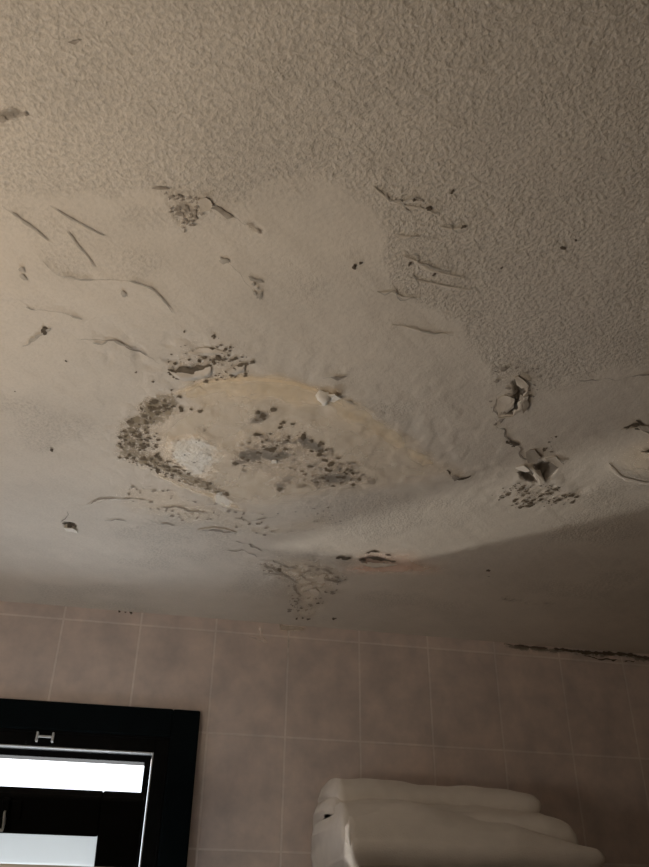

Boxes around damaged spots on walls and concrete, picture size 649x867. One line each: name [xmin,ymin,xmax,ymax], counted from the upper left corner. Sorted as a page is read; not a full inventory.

spalling [152,187,261,234]
peeling [81,334,255,391]
water stain [117,394,232,506]
peeling [227,408,376,492]
spalling [489,366,578,509]
water stain [263,560,346,629]
crack [507,644,649,662]